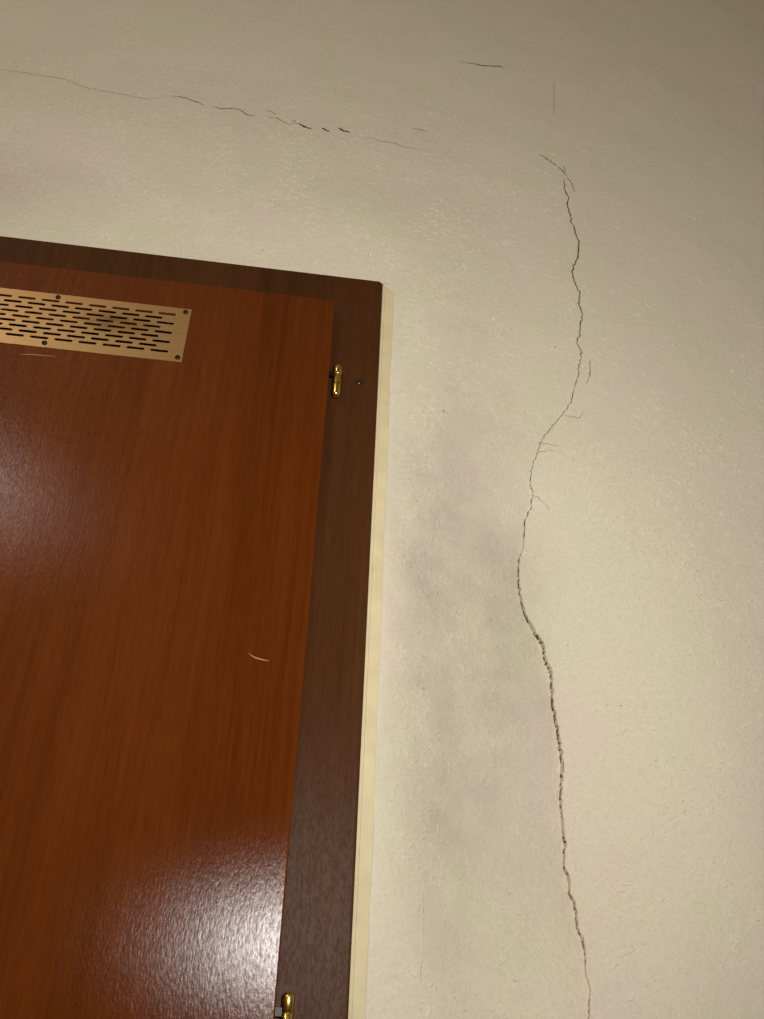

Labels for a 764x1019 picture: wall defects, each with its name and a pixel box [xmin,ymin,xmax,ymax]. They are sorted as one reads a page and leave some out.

crack [178,96,427,149]
crack [517,155,591,1019]